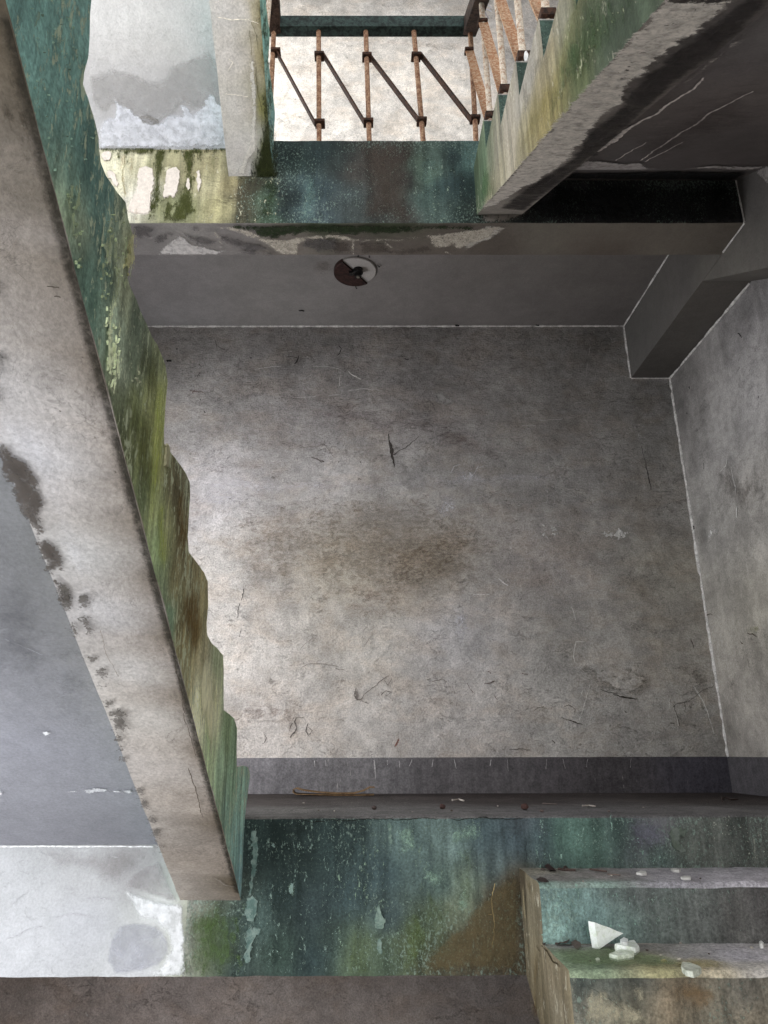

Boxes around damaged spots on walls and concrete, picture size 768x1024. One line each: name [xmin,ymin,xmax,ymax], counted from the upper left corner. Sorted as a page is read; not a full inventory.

leakage [100,95,225,148]
leakage [428,0,730,253]
crack [597,78,754,162]
flaking render [84,151,119,187]
leakage [698,166,768,183]
peeling [100,166,202,394]
leakage [0,445,95,637]
leakage [105,701,129,762]